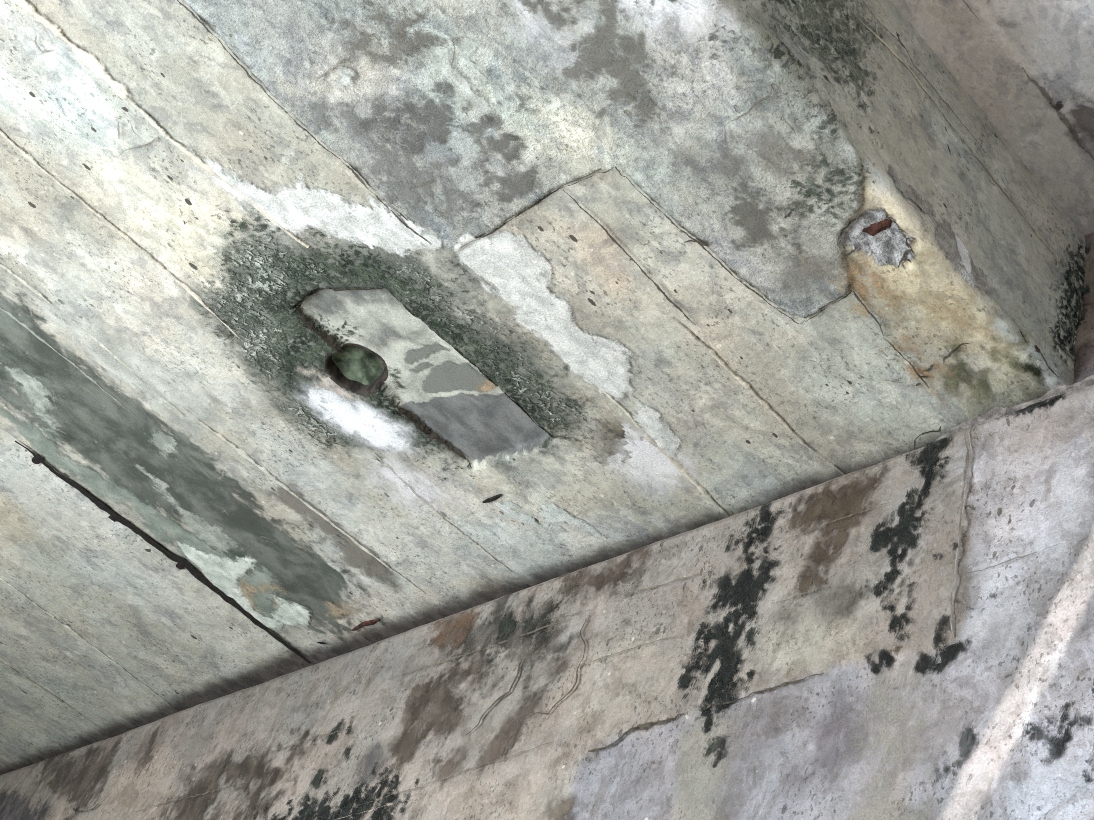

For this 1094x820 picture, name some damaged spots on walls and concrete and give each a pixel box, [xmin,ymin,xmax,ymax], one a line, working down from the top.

crack [177,0,431,245]
leakage [192,0,540,257]
leakage [520,0,577,30]
leakage [562,0,735,126]
crack [460,166,970,388]
spalling [838,208,914,267]
leakage [454,231,693,494]
leakage [0,287,970,820]
crack [614,571,708,601]
crack [392,610,695,734]
crack [357,739,560,806]